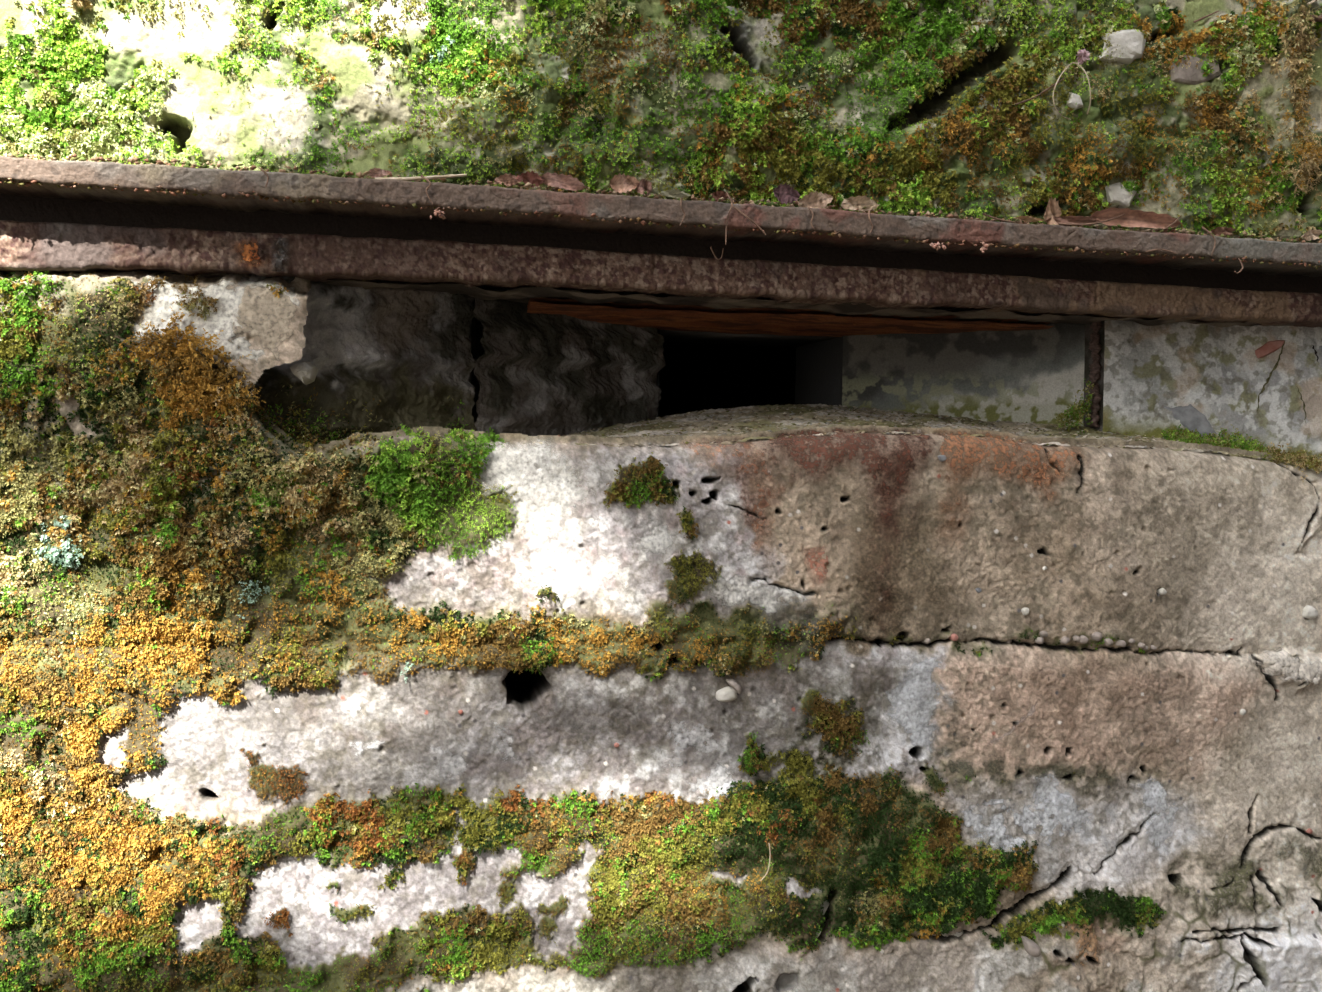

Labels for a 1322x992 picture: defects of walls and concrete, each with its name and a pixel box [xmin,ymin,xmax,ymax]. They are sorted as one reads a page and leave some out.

rust [237,238,287,272]
rust [1087,321,1103,427]
rust [689,428,1078,532]
crack [1277,464,1319,539]
crack [828,636,1304,700]
crack [1184,802,1319,984]